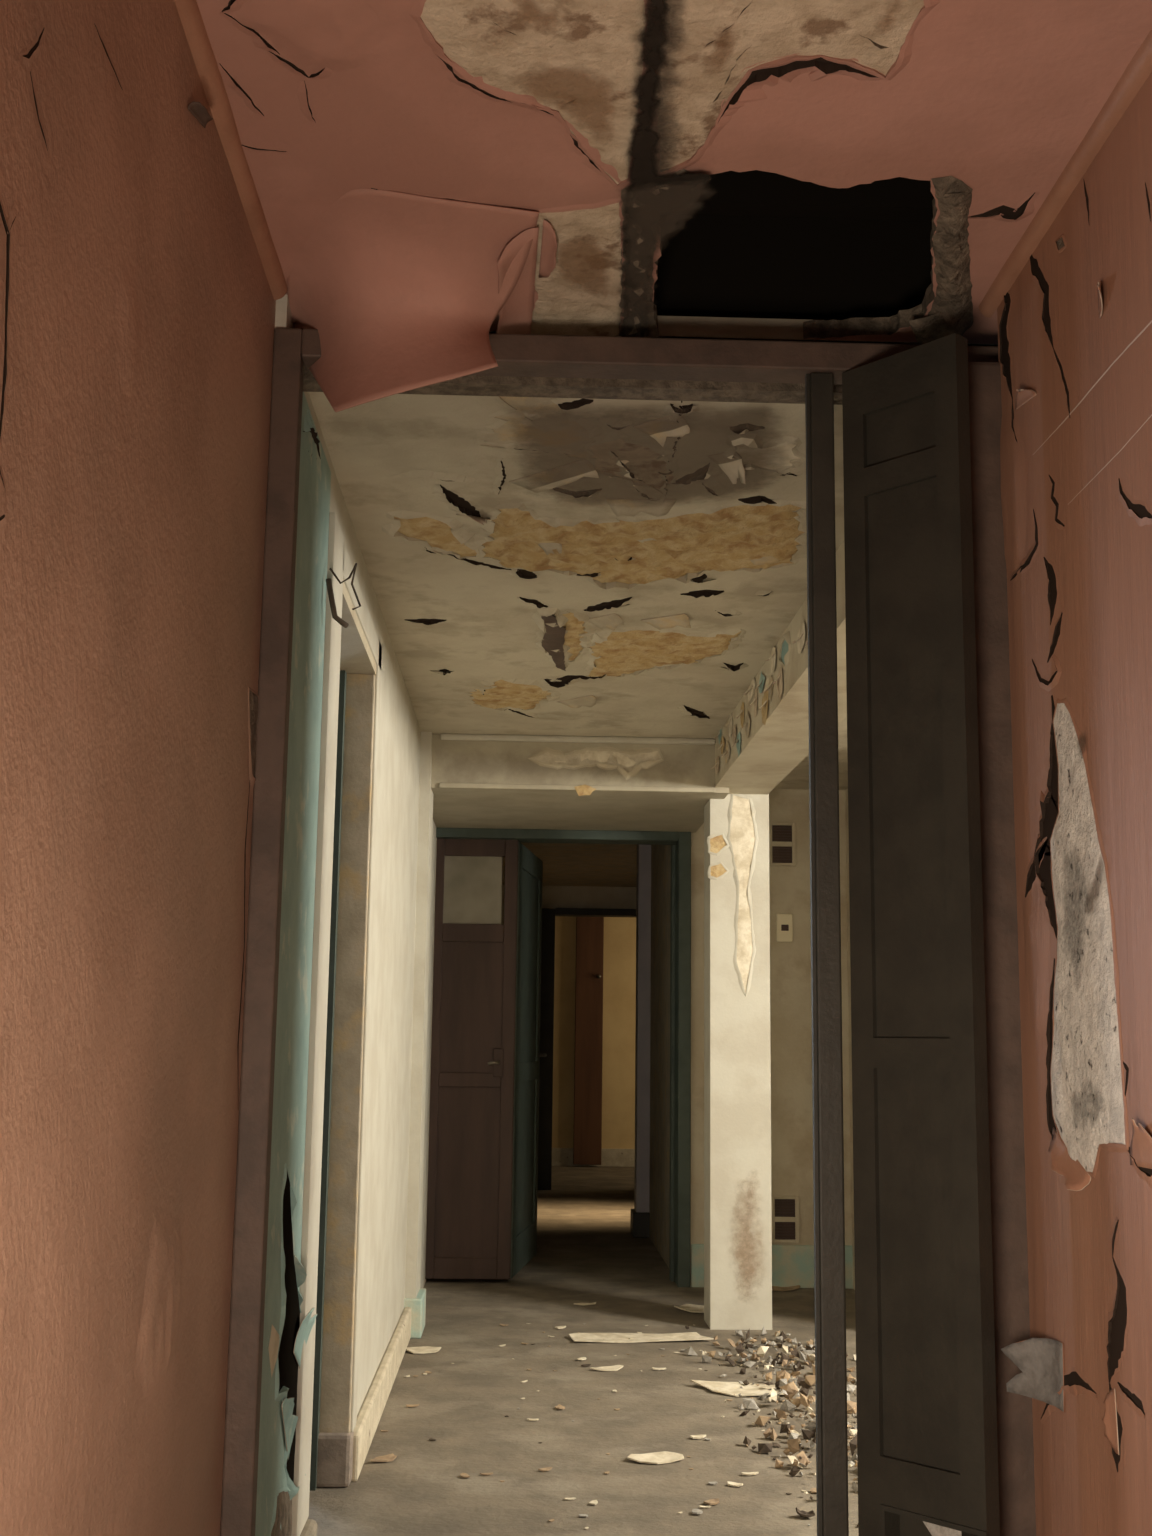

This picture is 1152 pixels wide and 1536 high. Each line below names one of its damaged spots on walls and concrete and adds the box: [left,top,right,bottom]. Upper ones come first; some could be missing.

crack [0,196,22,452]
crack [217,0,333,154]
peeling [286,0,940,412]
water stain [619,0,712,338]
spalling [909,176,973,345]
crack [968,192,1071,444]
spalling [382,436,807,589]
spalling [532,608,746,677]
spalling [1025,693,1129,1191]
crack [1123,1058,1152,1189]
peeling [267,1308,317,1378]
crack [1040,1217,1146,1473]